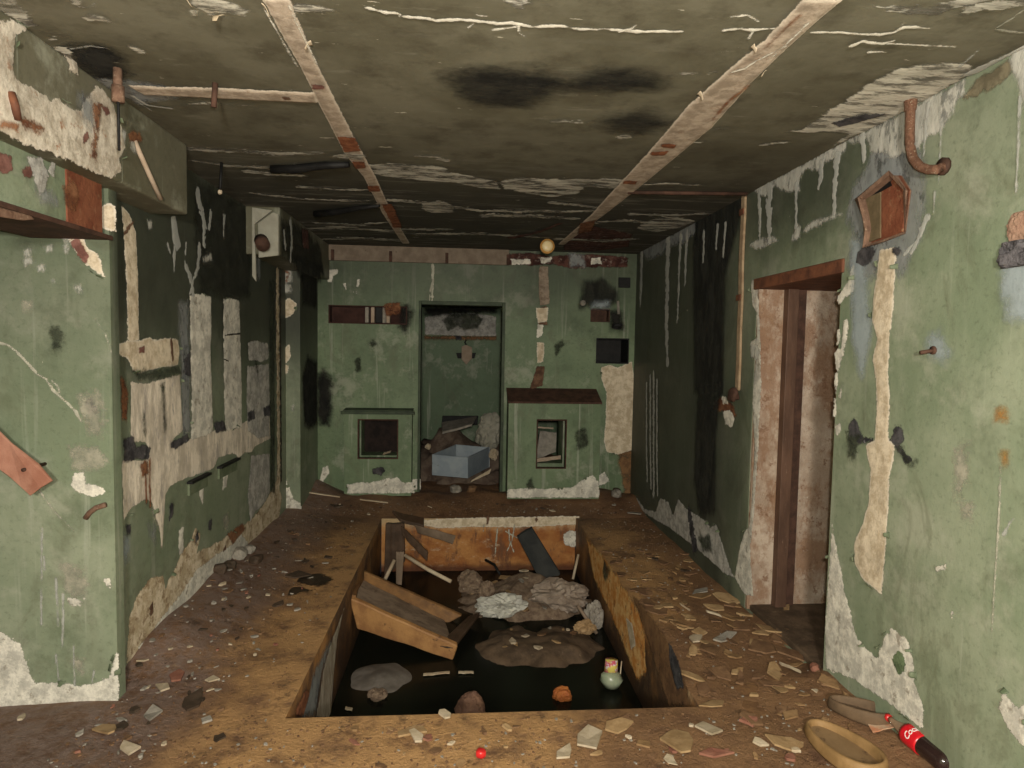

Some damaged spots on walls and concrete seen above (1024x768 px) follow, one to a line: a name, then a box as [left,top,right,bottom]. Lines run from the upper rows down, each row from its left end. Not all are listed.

spalling [0,0,136,179]
crack [365,7,683,35]
leakage [750,46,1024,374]
flaking render [0,203,302,722]
spalling [286,467,699,718]
peeling [600,362,634,455]
peeling [636,280,762,596]
peeling [825,247,924,728]